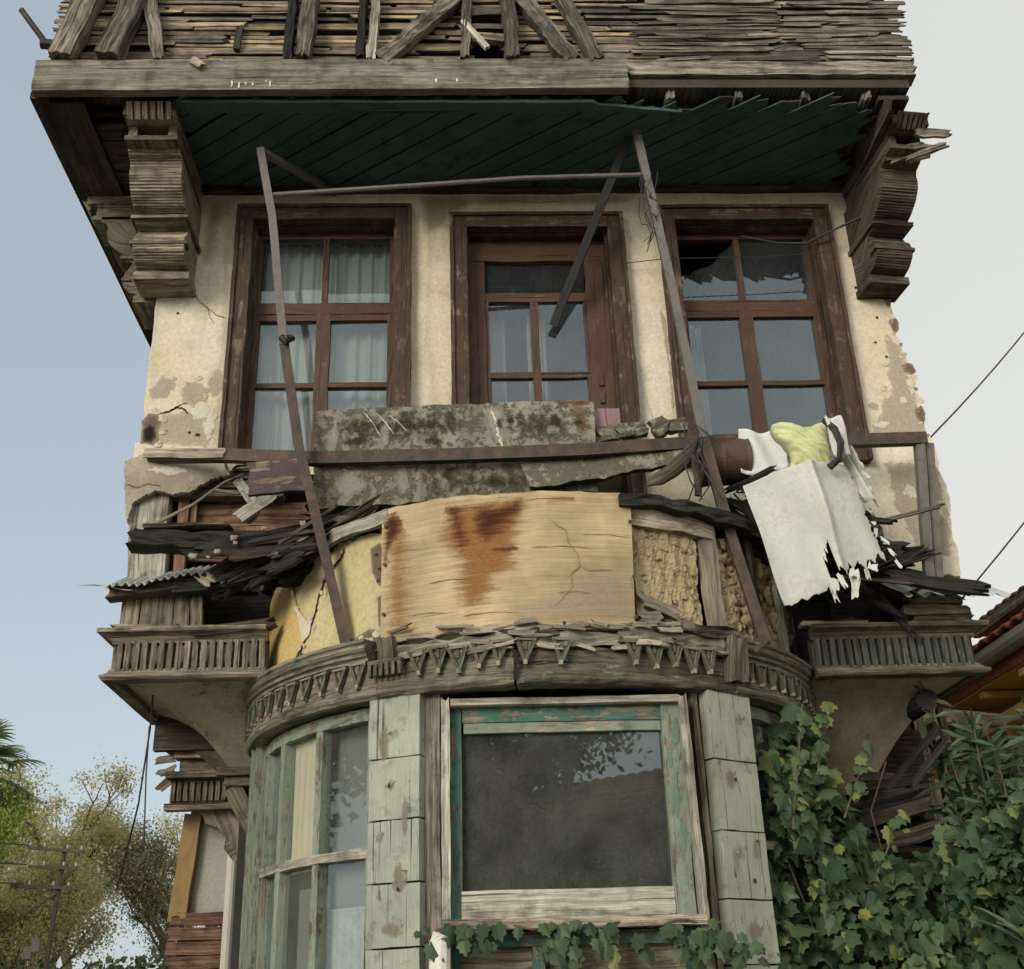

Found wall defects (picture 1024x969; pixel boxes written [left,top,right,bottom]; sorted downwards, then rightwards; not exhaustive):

peeling [868,299,935,447]
peeling [140,369,223,448]
leakage [326,408,461,451]
leakage [483,407,570,446]
leakage [334,472,365,497]
leakage [395,465,408,493]
leakage [428,464,523,494]
rust [383,512,411,626]
rust [445,500,521,606]
crack [531,534,628,548]
crack [298,547,345,656]
crack [408,610,514,618]